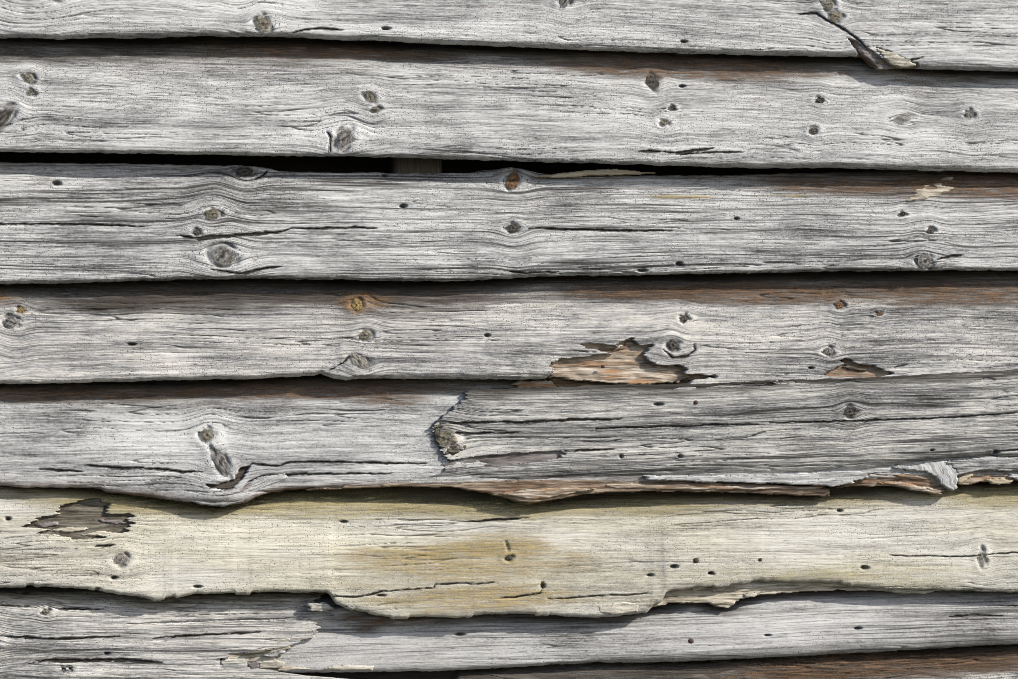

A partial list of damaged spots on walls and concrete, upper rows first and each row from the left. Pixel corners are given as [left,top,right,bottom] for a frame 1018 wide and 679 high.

crack [802,12,870,54]
peeling [598,341,635,351]
crack [241,461,425,482]
peeling [499,483,825,500]
peeling [878,474,944,495]
peeling [21,493,135,540]